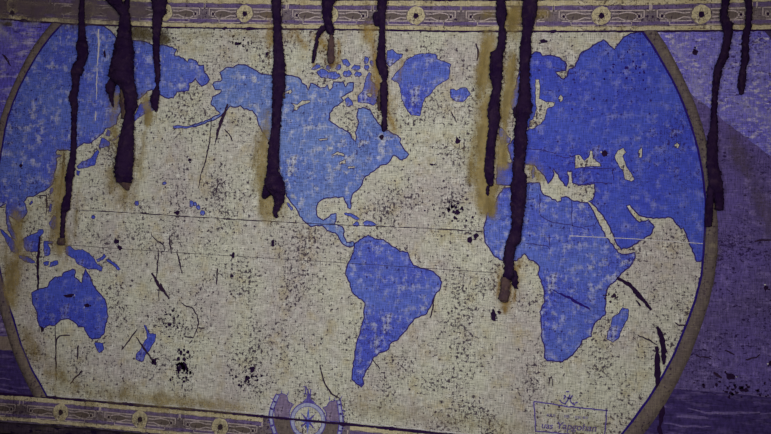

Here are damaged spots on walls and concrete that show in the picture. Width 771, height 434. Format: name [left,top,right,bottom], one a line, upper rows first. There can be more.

corrosion [0,18,118,27]
corrosion [131,25,327,50]
corrosion [334,0,522,216]
corrosion [256,129,274,217]